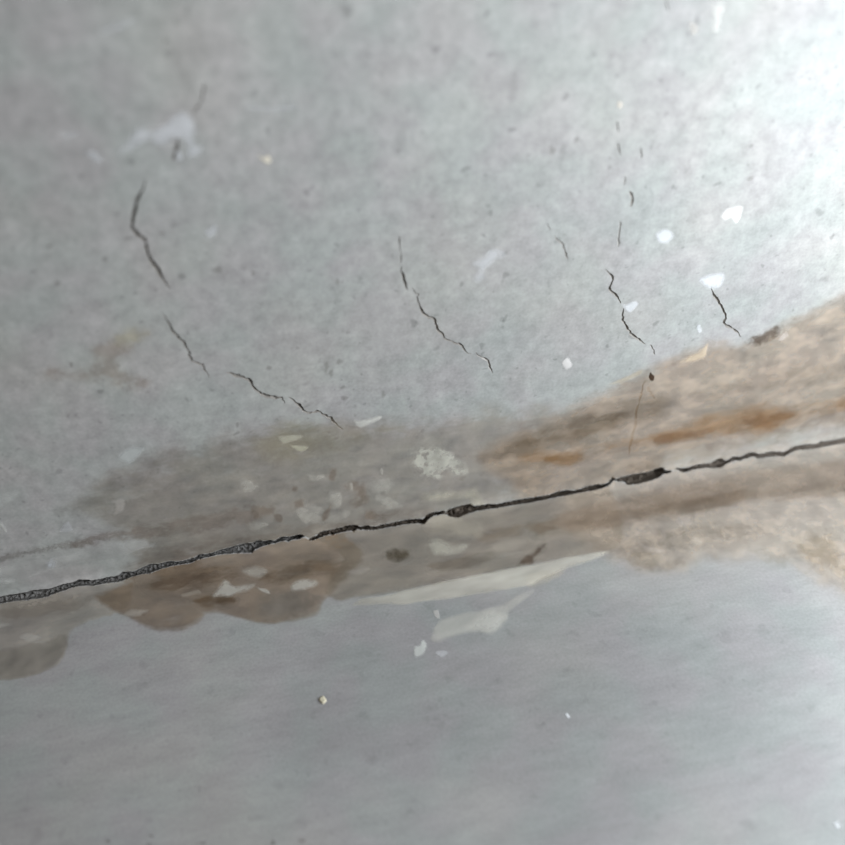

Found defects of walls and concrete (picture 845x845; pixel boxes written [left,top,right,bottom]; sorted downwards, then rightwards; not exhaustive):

crack [171,138,179,160]
crack [131,178,170,288]
crack [163,314,343,430]
crack [398,237,493,373]
crack [605,269,655,355]
water stain [486,305,845,497]
crack [711,286,761,345]
crack [0,438,845,604]